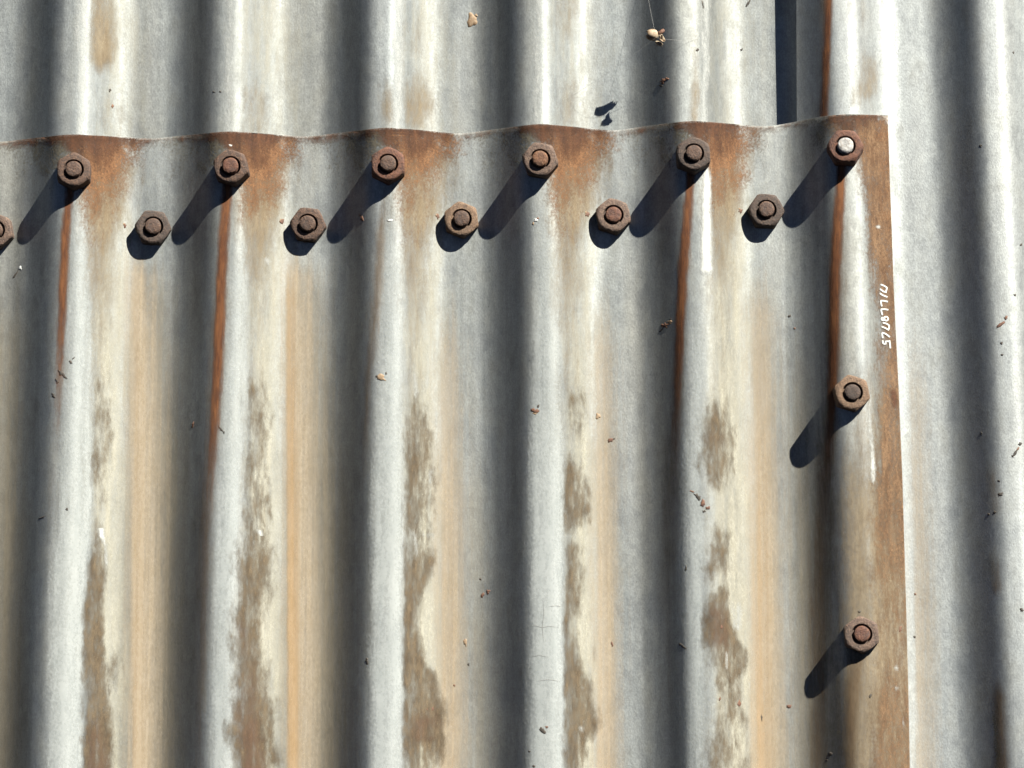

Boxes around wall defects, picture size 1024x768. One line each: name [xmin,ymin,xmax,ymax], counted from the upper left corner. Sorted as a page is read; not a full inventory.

corrosion [4,134,152,367]
leakage [48,230,129,768]
leakage [213,259,283,768]
corrosion [180,128,477,451]
leakage [371,242,442,768]
corrosion [505,124,615,263]
leakage [529,299,599,768]
leakage [717,208,751,768]
corrosion [673,0,910,768]